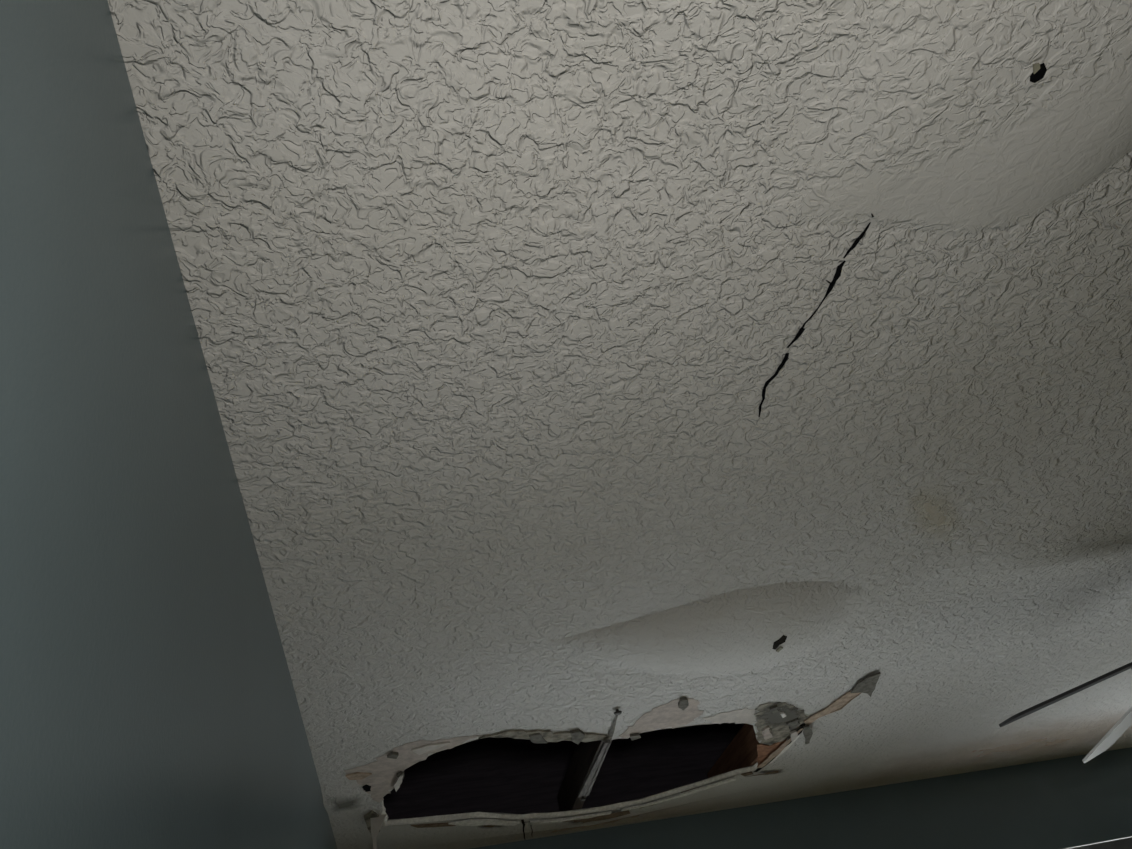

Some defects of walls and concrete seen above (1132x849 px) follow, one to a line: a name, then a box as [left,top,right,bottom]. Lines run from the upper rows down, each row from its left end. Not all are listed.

crack [759,213,874,417]
peeling [344,735,482,803]